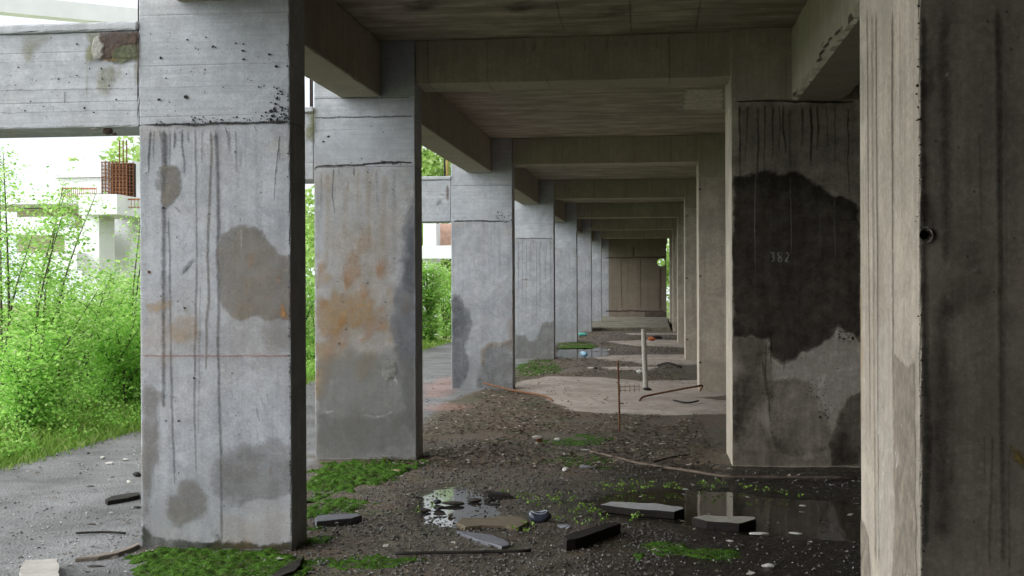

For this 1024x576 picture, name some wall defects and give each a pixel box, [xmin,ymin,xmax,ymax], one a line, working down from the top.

spalling [85,0,151,86]
damp [148,133,183,319]
damp [196,184,290,322]
damp [732,40,878,451]
damp [830,393,861,465]